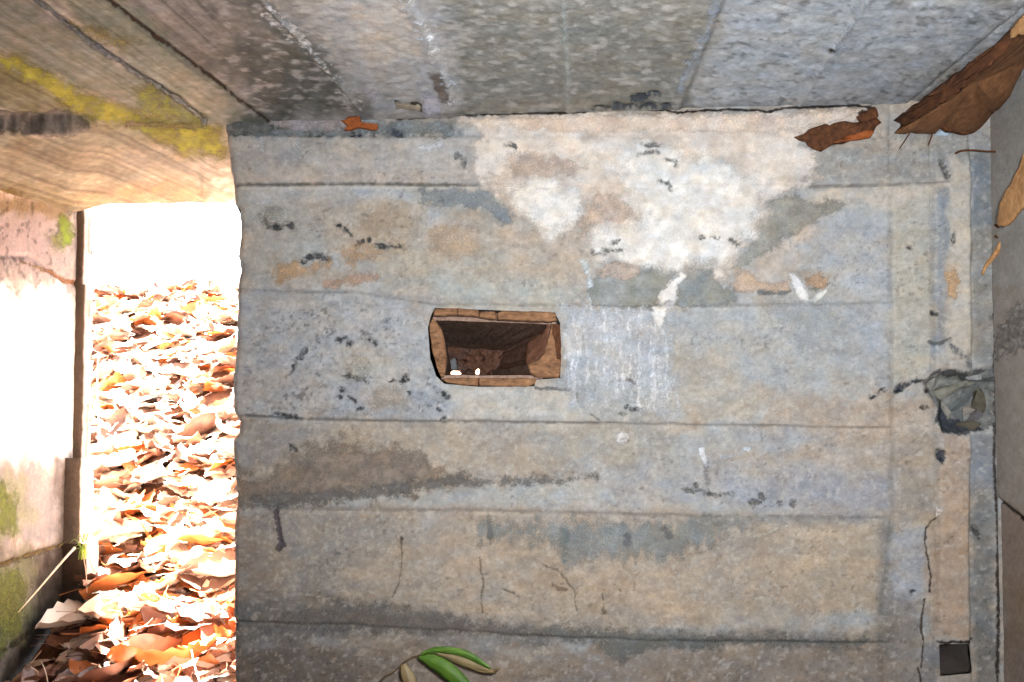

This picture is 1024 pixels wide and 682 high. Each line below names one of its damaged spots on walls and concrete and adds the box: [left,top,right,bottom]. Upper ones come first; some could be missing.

leakage [419,104,871,411]
spalling [893,303,1024,436]
leakage [234,433,599,510]
leakage [478,513,743,567]
crack [914,312,1024,682]